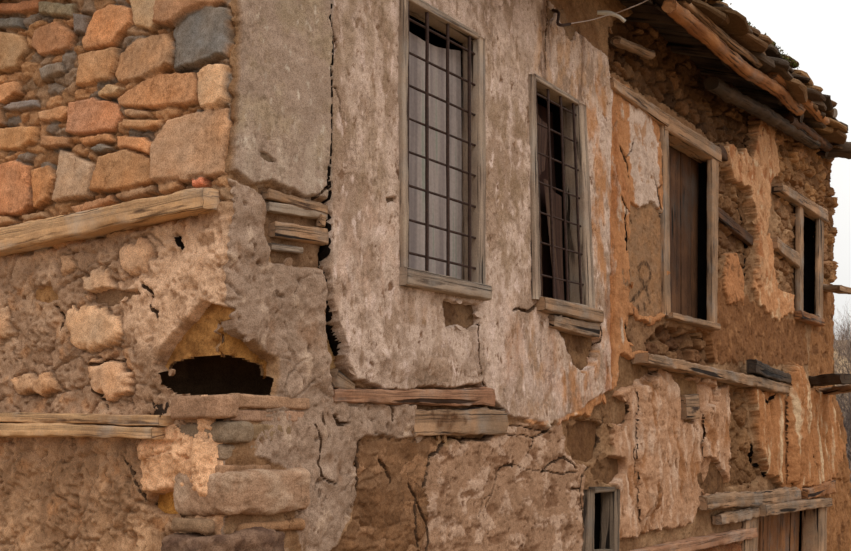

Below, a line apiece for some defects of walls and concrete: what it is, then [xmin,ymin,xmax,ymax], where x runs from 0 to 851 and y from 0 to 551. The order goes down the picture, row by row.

crack [311,4,341,356]
crack [620,140,634,251]
spalling [718,163,755,282]
spalling [159,304,274,396]
spalling [442,299,483,331]
spalling [559,332,594,373]
spalling [566,202,709,484]
crack [314,413,348,484]
spalling [331,434,484,551]
crack [354,435,486,551]
crack [478,424,587,528]
crack [594,402,629,448]